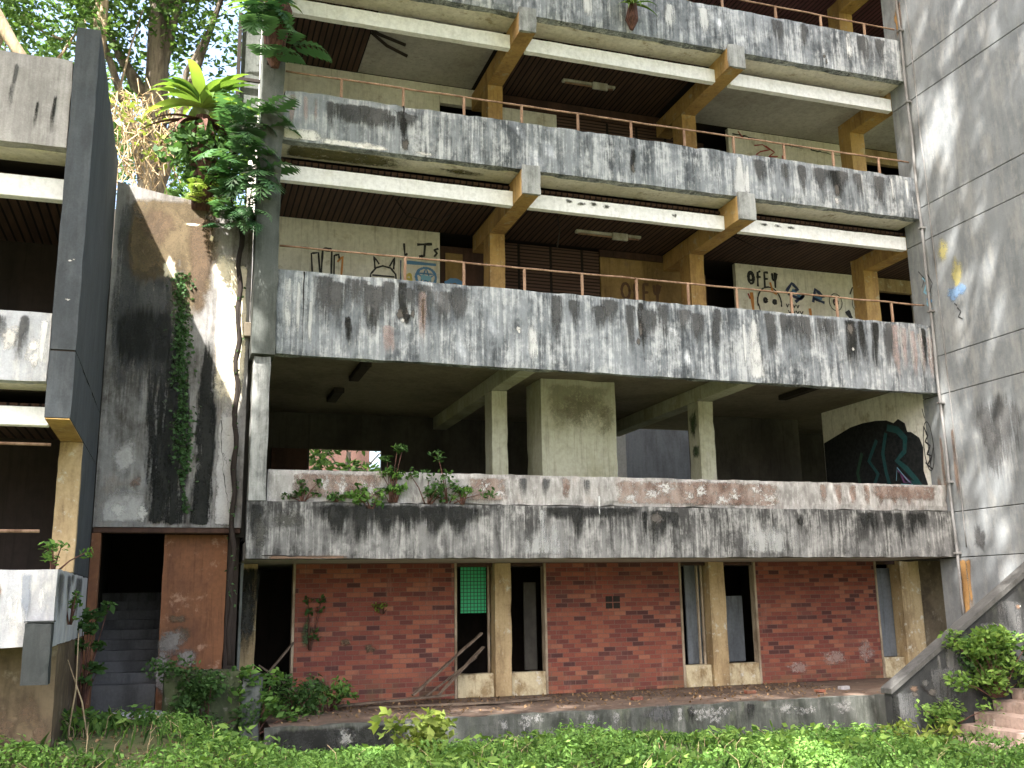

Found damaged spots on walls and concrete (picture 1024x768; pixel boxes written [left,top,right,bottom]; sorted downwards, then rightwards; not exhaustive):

water stain [665,4,675,26]
water stain [698,8,708,31]
water stain [771,19,784,42]
water stain [846,34,884,61]
water stain [327,102,416,129]
water stain [287,145,396,167]
water stain [285,276,468,341]
water stain [552,295,721,345]
water stain [529,328,538,358]
water stain [111,204,217,525]
water stain [318,505,480,539]
water stain [526,478,679,553]